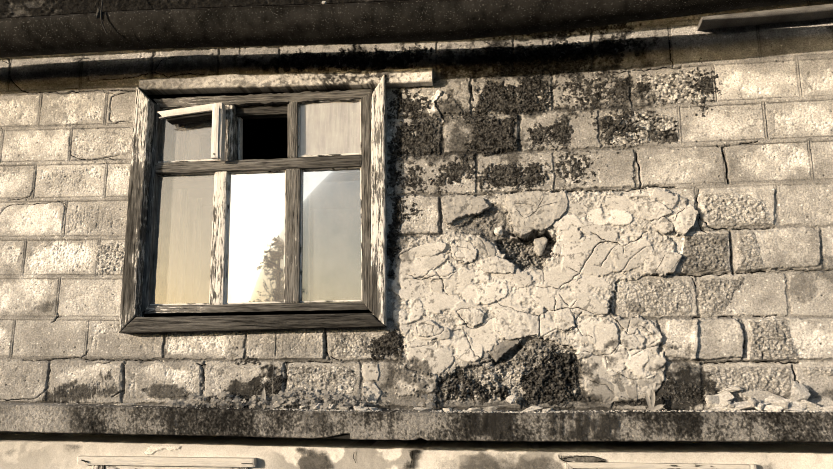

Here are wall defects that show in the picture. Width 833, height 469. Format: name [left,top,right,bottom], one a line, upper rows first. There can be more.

crack [3,57,214,124]
crack [443,153,675,217]
crack [655,192,829,287]
crack [411,231,660,390]
flaking render [388,187,833,404]
crack [0,352,163,401]
crack [701,315,799,383]
water stain [296,448,333,469]
water stain [404,449,420,469]
water stain [460,413,516,439]